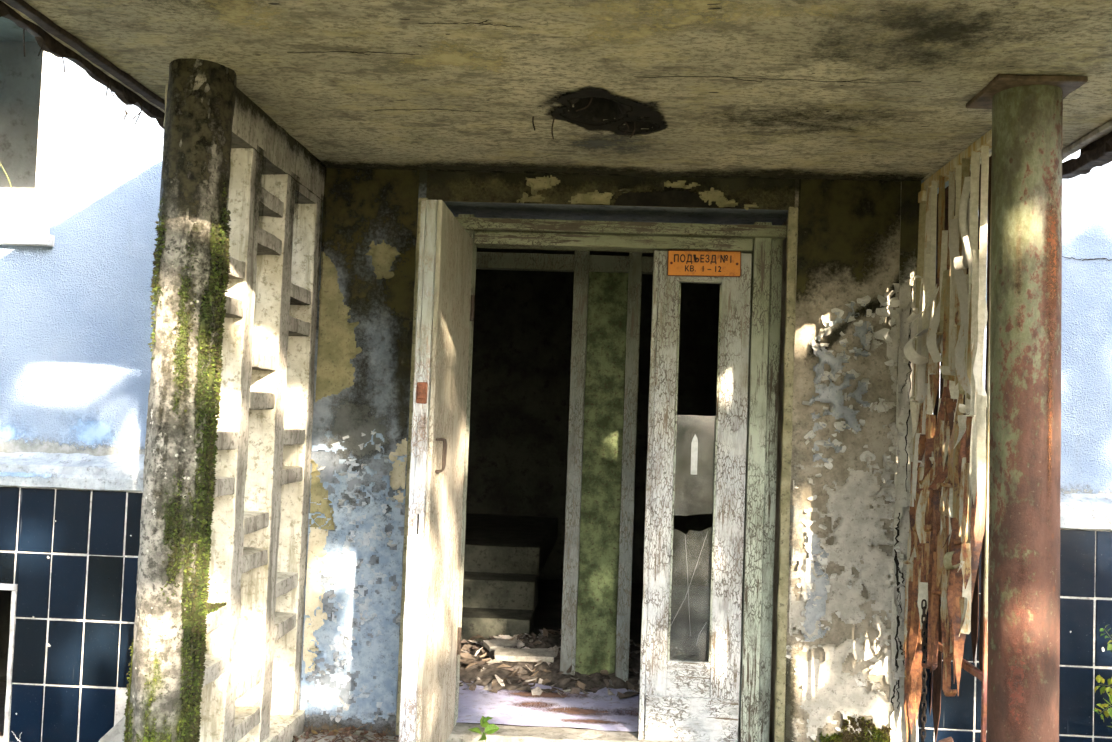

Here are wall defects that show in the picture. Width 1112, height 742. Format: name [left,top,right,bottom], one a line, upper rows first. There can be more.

leakage [798,0,1067,71]
hole [532,88,668,139]
peeling [315,252,362,402]
peeling [516,175,560,203]
leakage [159,58,926,471]
spalling [568,180,759,210]
corrosion [1045,203,1059,338]
peeling [300,429,407,724]
peeling [785,274,922,740]
crack [891,274,913,715]
corrosion [1005,560,1028,741]